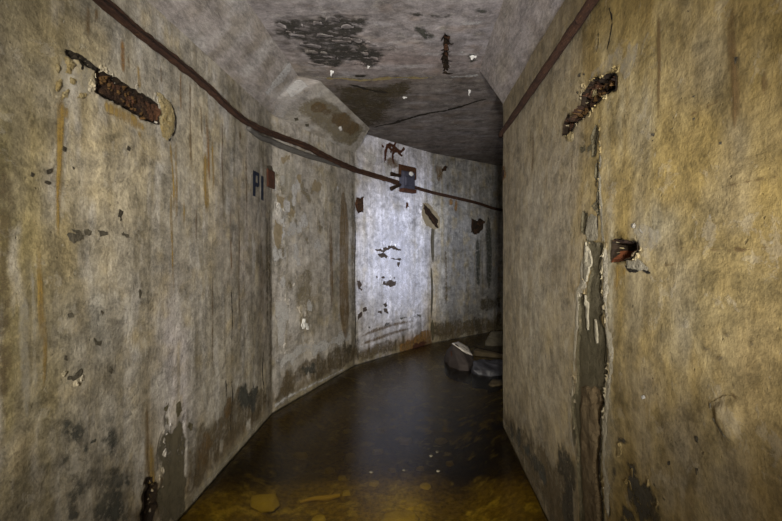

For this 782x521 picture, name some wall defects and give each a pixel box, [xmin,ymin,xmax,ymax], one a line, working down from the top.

spalling [55,56,177,200]
crack [374,99,486,128]
spalling [562,65,619,142]
corrosion [56,105,68,225]
corrosion [382,142,405,167]
spalling [419,203,440,229]
spalling [471,218,485,235]
peeling [375,241,401,267]
peeling [571,120,651,521]
flaking render [61,368,84,387]
peeling [621,463,665,521]